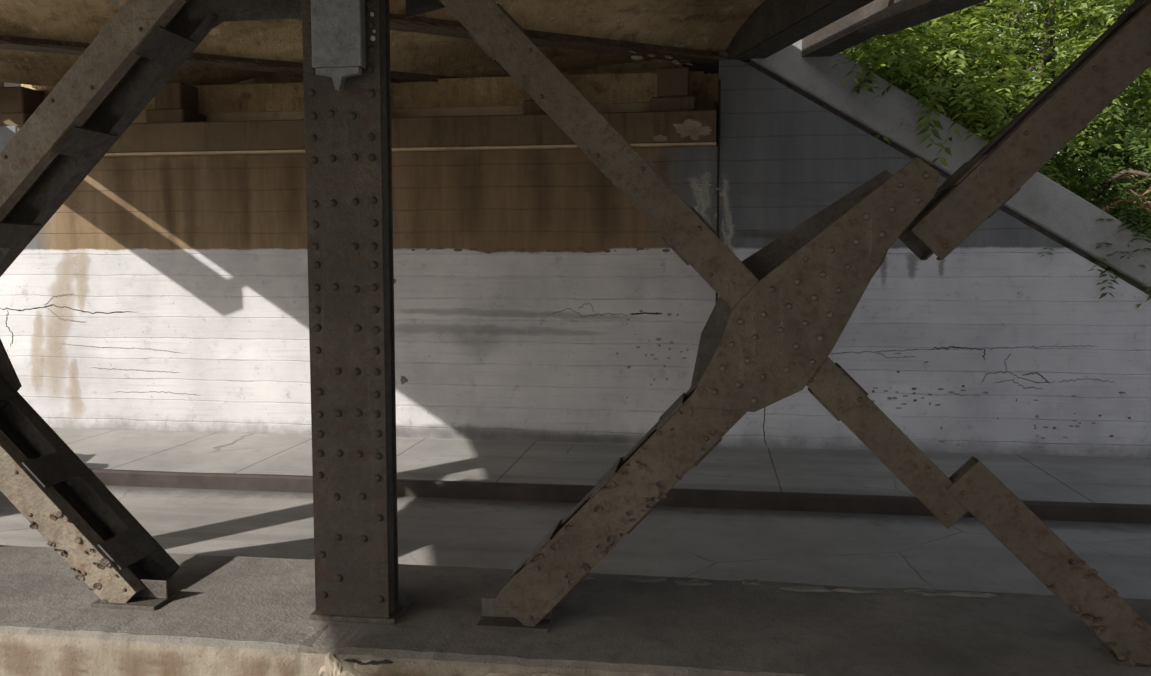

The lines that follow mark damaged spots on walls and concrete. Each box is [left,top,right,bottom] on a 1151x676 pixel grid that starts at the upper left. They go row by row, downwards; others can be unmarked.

leakage [691,174,735,251]
crack [0,293,196,395]
crack [830,345,1114,390]
spalling [319,652,393,676]